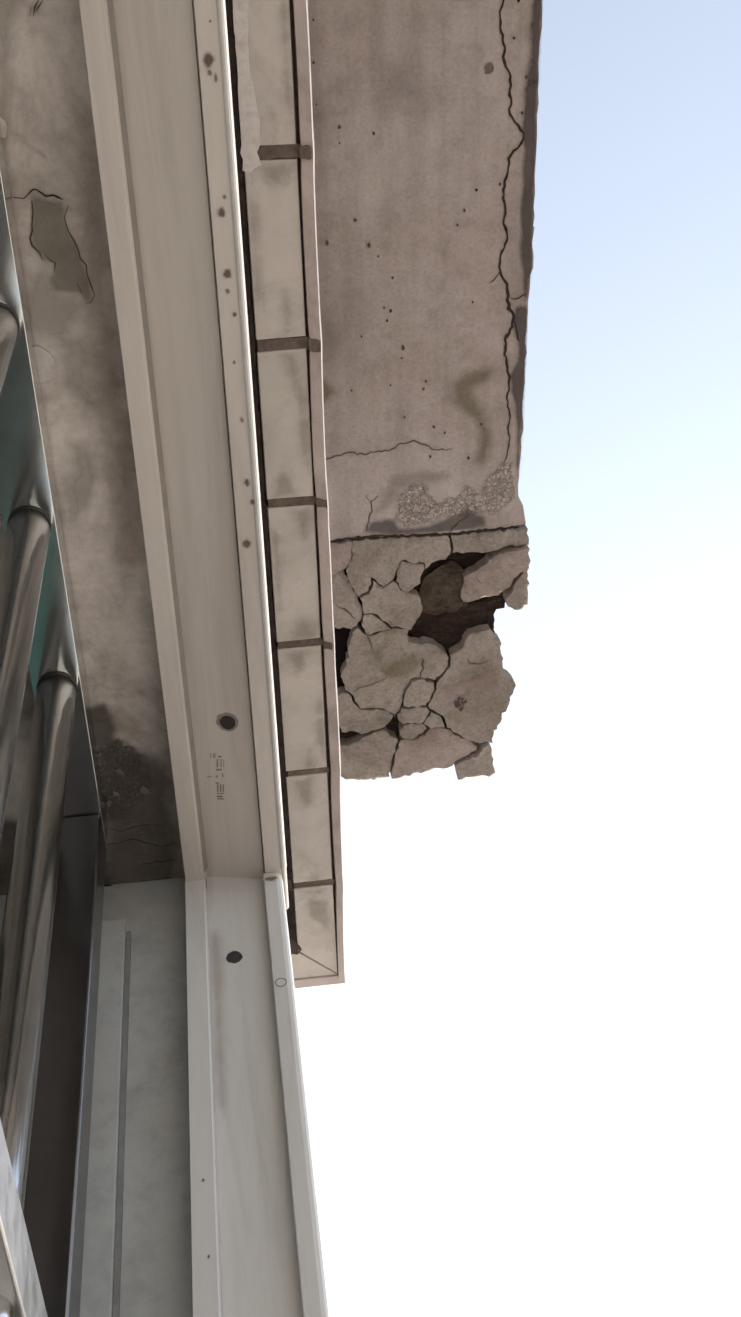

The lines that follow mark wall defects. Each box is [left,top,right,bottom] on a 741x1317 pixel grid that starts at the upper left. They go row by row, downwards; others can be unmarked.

crack [490,0,526,461]
crack [326,440,449,460]
flaking render [396,462,514,526]
spalling [407,551,505,655]
spalling [386,718,400,736]
leakage [91,706,173,885]
leakage [0,822,17,895]